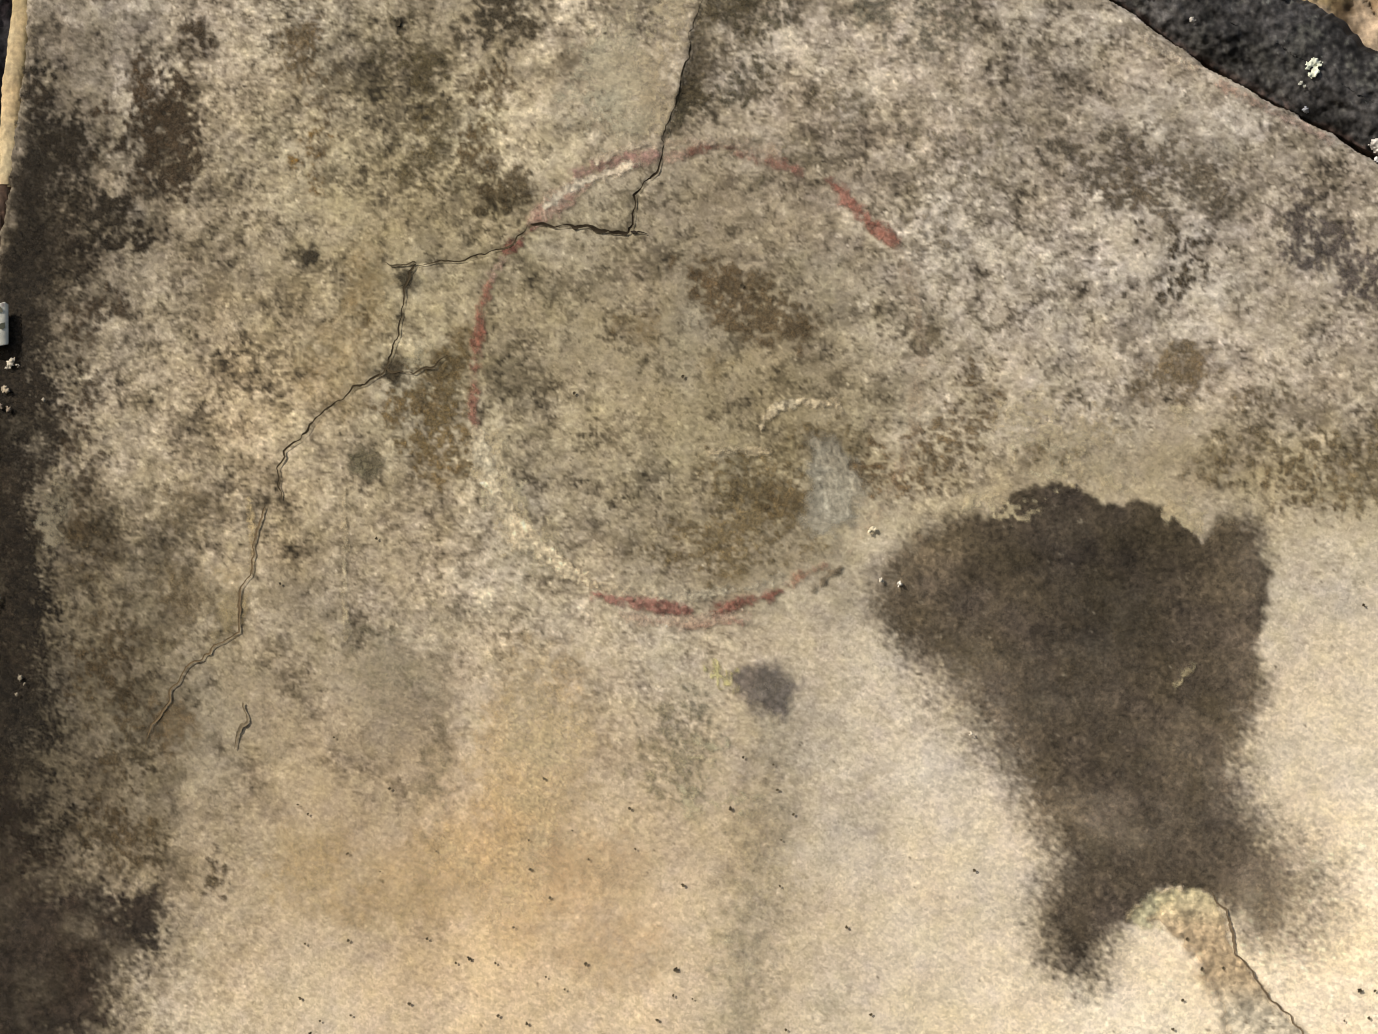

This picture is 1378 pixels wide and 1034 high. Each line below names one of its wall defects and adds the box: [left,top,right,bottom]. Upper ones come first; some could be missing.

crack [145,0,703,749]
leakage [1125,340,1222,408]
leakage [1181,380,1378,522]
leakage [0,17,217,1034]
leakage [875,482,1319,998]
leakage [202,847,226,899]
crack [1202,887,1304,1034]